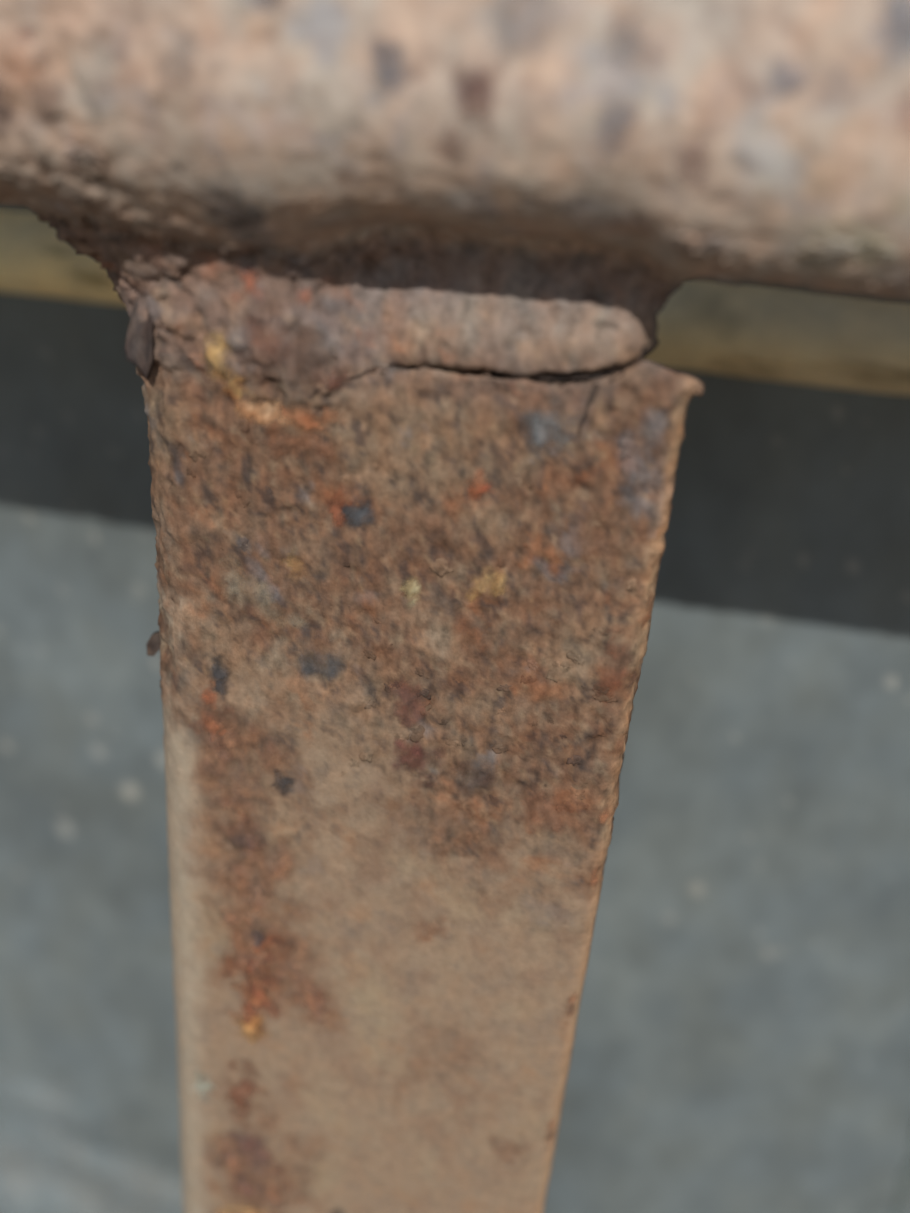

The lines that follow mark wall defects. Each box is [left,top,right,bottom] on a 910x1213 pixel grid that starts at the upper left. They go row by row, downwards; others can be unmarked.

rust [206,335,335,458]
crack [313,346,646,437]
rust [401,581,420,602]
rust [146,631,161,656]
rust [393,667,447,777]